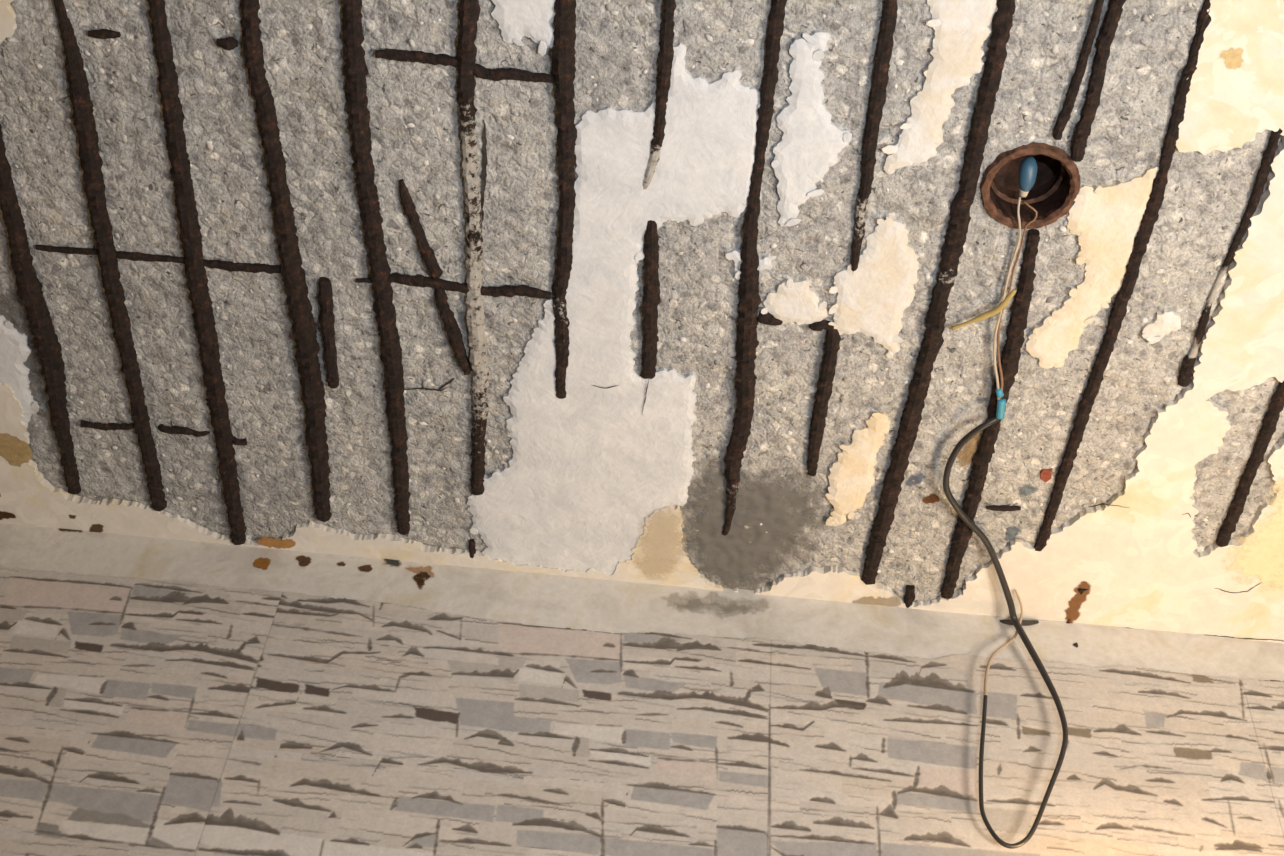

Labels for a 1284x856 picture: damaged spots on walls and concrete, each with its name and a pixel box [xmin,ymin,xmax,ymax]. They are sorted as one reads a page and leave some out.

spalling [0,0,1284,608]
rust [957,432,982,465]
rust [923,494,940,504]
rust [59,515,103,533]
damp [682,461,826,589]
rust [253,536,311,570]
rust [406,566,434,589]
rust [1065,581,1090,623]